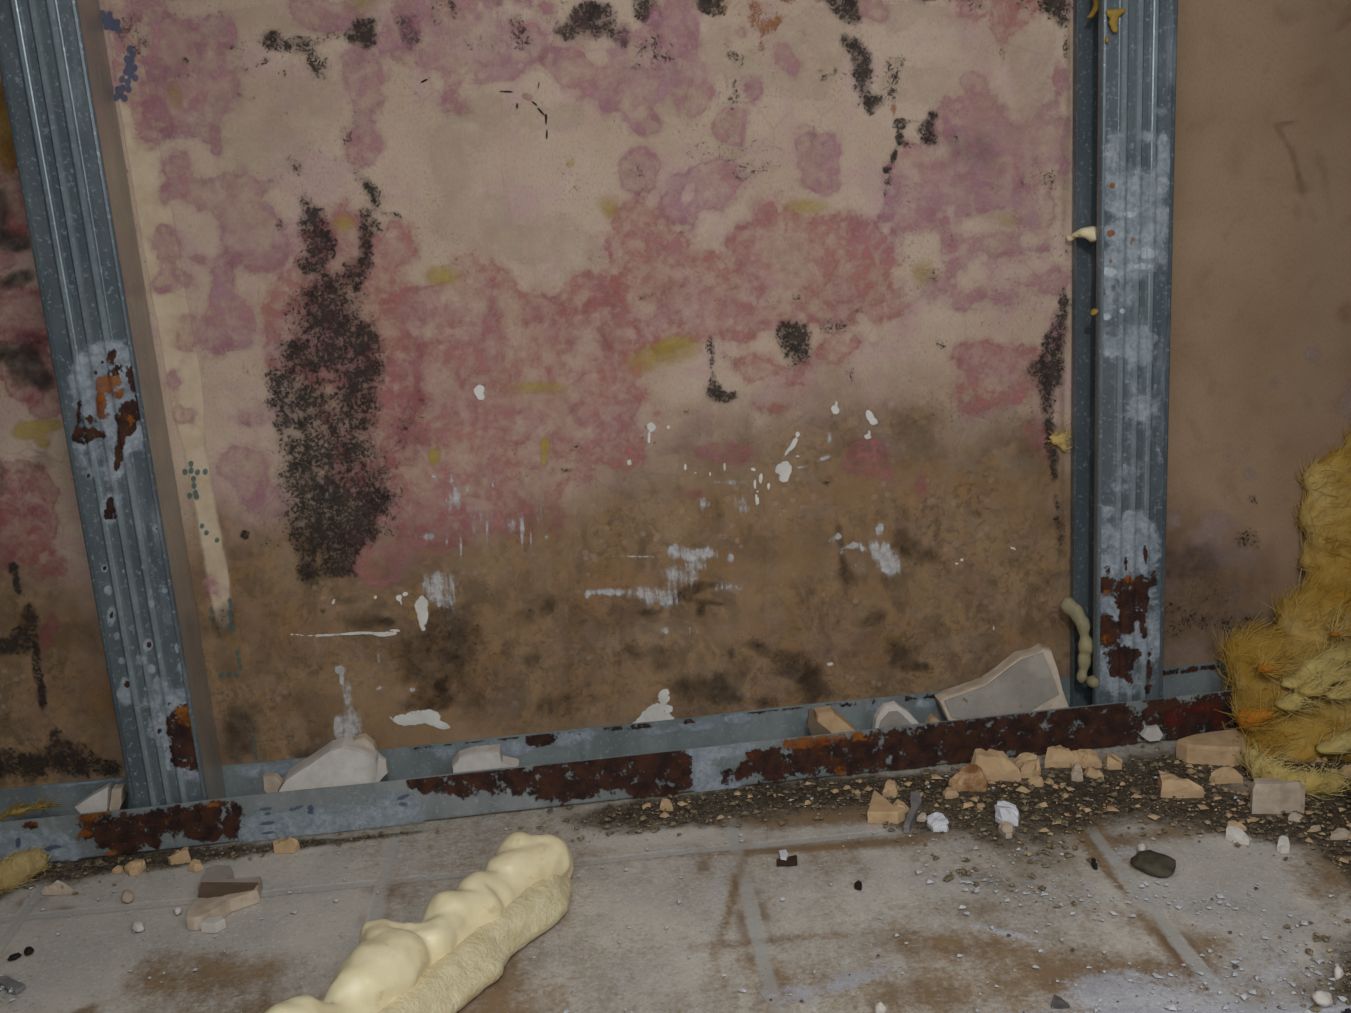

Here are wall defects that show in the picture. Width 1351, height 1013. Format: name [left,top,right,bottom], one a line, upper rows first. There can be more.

damp [0,83,17,171]
damp [109,0,502,198]
damp [4,271,39,296]
damp [0,328,52,403]
corrosion [68,341,144,523]
damp [177,0,1073,766]
corrosion [1103,131,1170,441]
damp [0,470,124,789]
corrosion [0,506,1239,861]